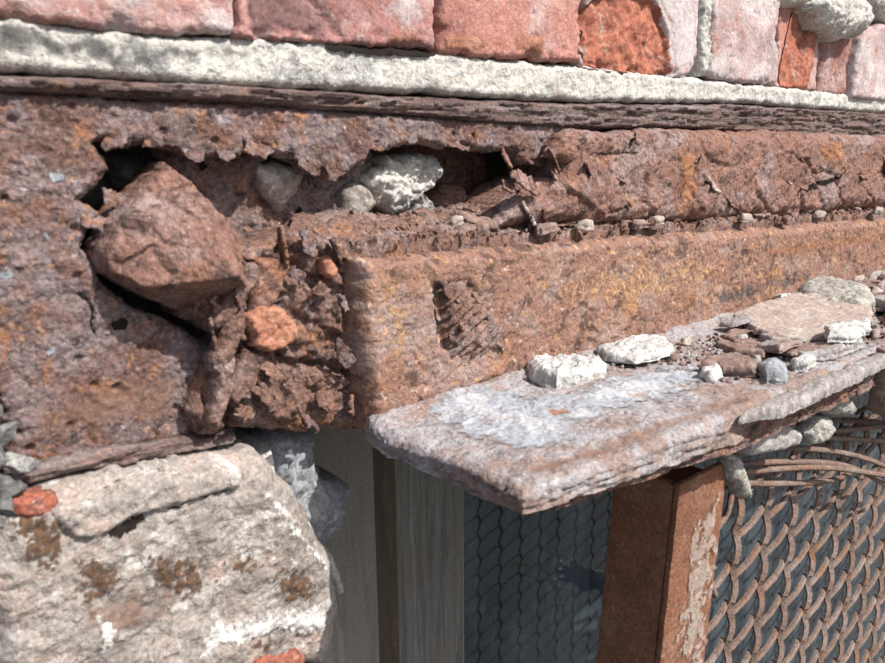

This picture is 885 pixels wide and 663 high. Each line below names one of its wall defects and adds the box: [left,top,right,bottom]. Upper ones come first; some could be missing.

rust [448,128,885,237]
spalling [111,317,128,330]
rust [202,255,290,424]
spalling [244,305,299,352]
spalling [316,255,338,279]
rust [436,279,509,358]
rust [559,252,715,308]
spalling [757,353,816,385]
rust [697,270,885,377]
rust [553,369,885,510]
peeling [795,400,857,445]
peeling [676,453,752,663]